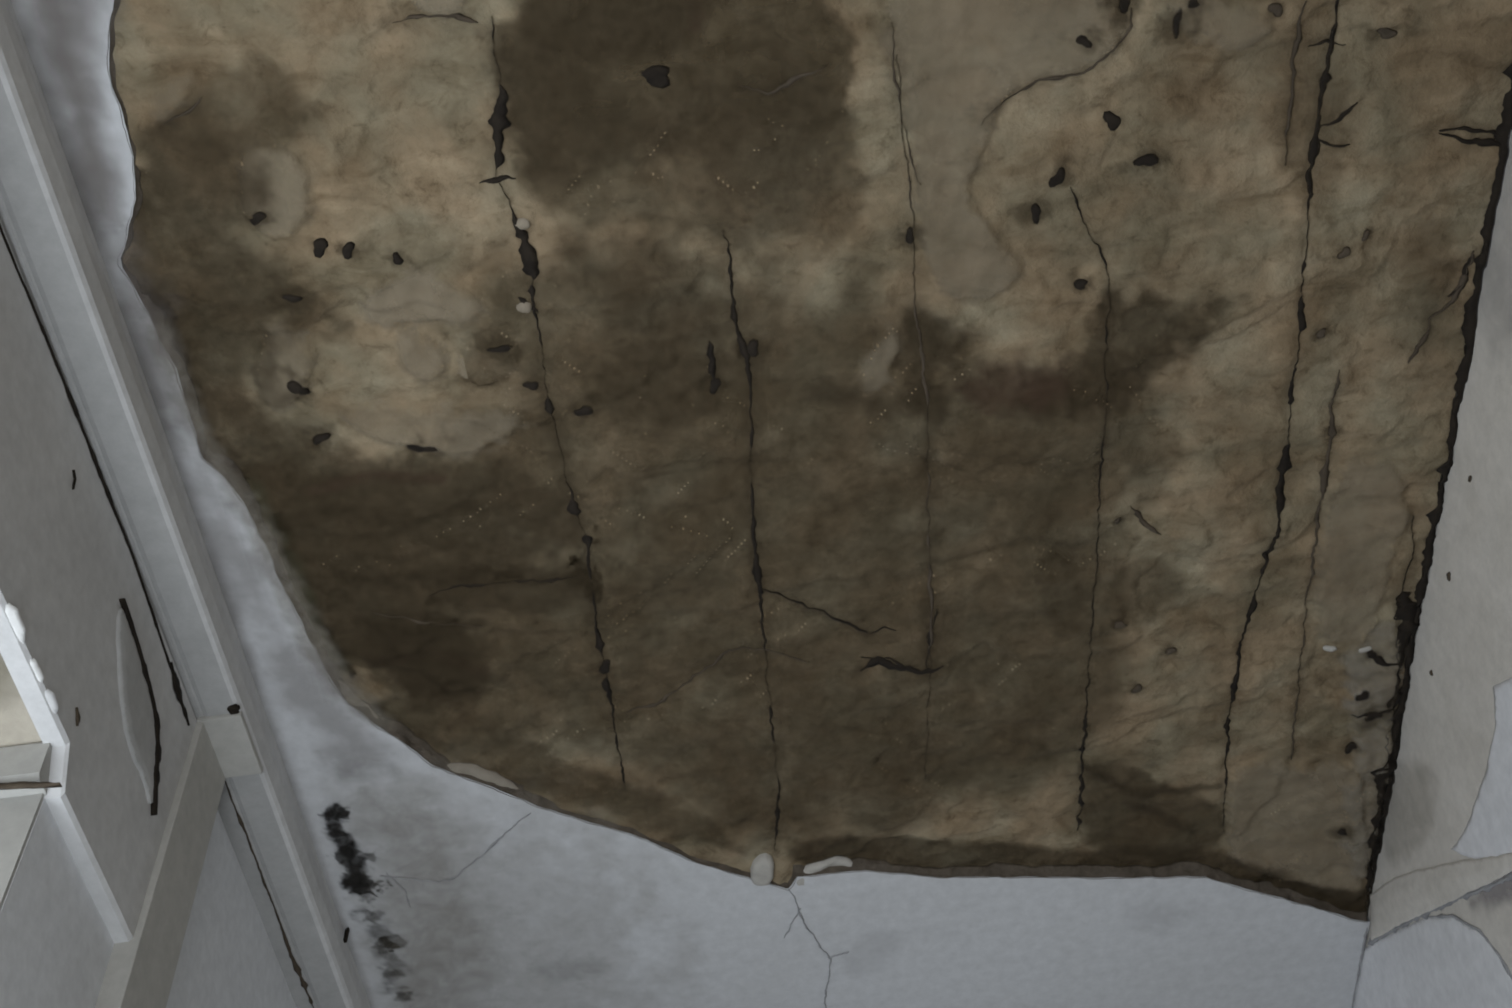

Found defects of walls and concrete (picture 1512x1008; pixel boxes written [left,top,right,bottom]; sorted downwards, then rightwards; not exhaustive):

damp [495,0,853,185]
spalling [361,271,469,327]
spalling [405,352,448,378]
crack [373,13,626,798]
damp [132,128,1368,913]
crack [706,24,944,849]
crack [1223,0,1358,833]
crack [1351,64,1512,1008]
peeling [116,598,162,816]
spalling [1228,761,1372,896]
peeling [1451,678,1512,859]
crack [784,889,849,1007]